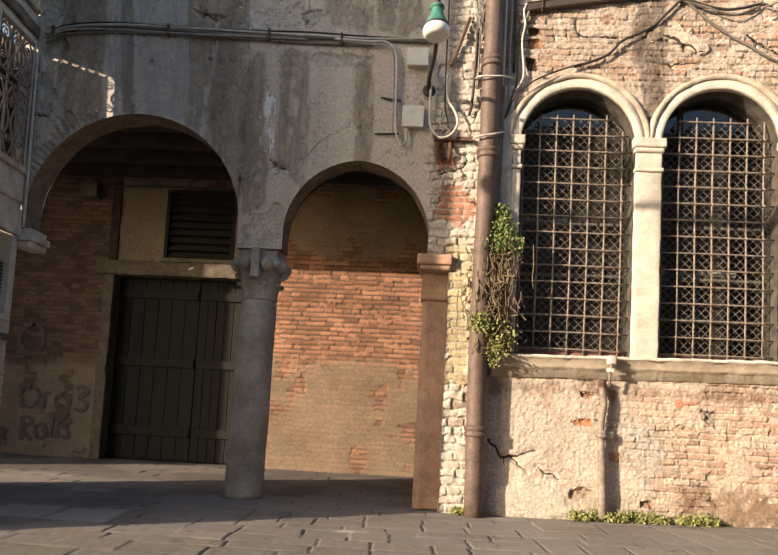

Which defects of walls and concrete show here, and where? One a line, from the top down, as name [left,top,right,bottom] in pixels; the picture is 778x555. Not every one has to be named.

leakage [58,0,135,131]
flaking render [30,109,101,184]
leakage [188,0,266,213]
leakage [278,49,309,186]
spalling [239,202,284,249]
flaking render [433,176,476,226]
crack [487,439,559,480]